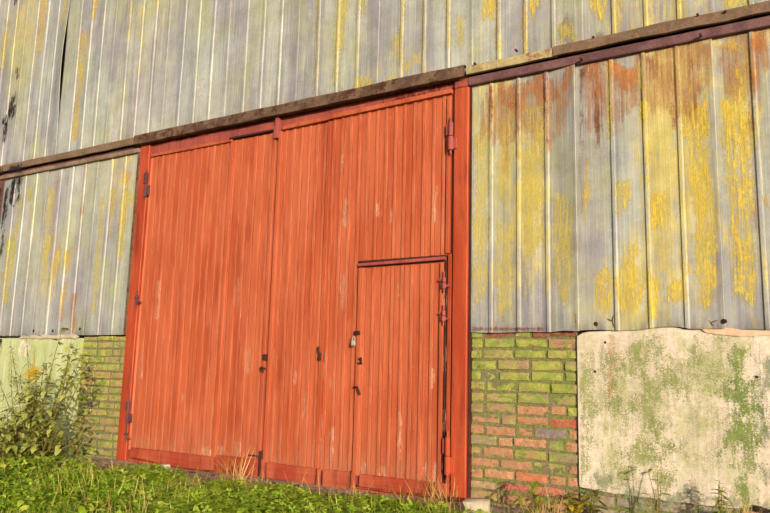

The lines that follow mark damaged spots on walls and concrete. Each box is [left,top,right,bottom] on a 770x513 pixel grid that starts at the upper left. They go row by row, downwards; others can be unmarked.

corrosion [482,29,769,149]
damp [594,472,613,490]
damp [656,484,770,509]